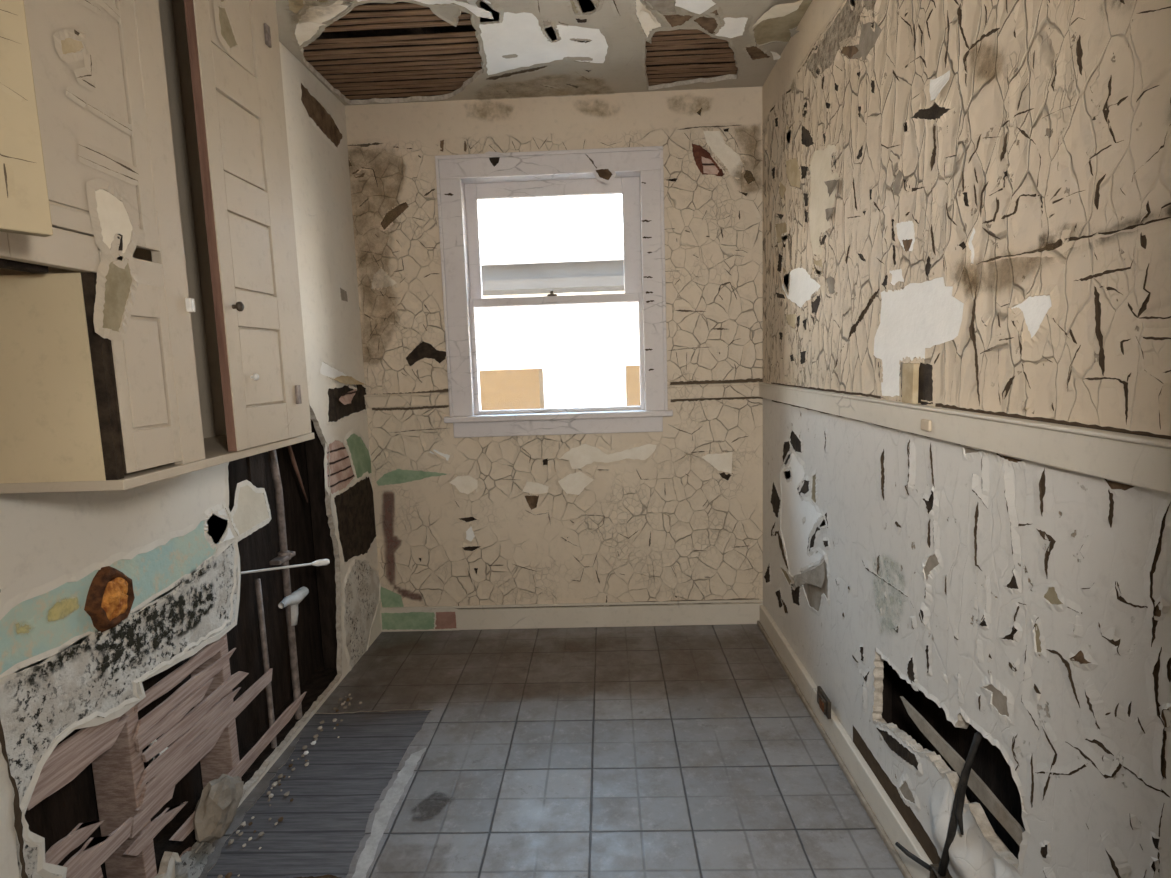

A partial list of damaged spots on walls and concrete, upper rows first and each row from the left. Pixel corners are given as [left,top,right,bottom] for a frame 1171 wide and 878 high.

peeling [289,0,613,181]
peeling [86,178,139,341]
crack [347,138,454,324]
rust [101,575,128,621]
damp [19,562,217,685]
peeling [0,358,484,878]
crack [372,368,451,436]
crack [406,446,806,617]
peeling [764,426,831,616]
crack [597,0,1171,878]
crack [0,718,28,878]
spalling [859,605,1052,877]